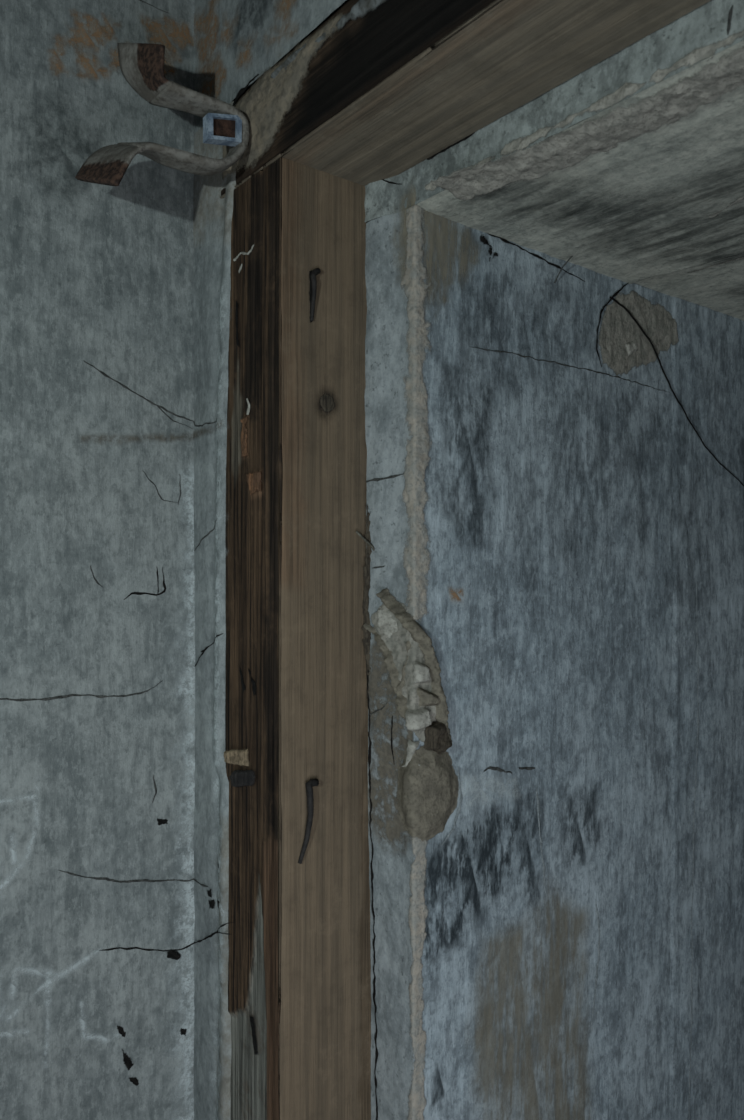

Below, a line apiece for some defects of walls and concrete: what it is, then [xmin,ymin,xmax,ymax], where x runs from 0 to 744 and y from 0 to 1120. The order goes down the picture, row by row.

crack [480,233,585,282]
spalling [596,283,679,376]
crack [472,347,670,393]
crack [84,361,217,429]
crack [143,471,181,504]
crack [90,565,166,600]
crack [195,633,223,666]
crack [0,680,163,701]
spalling [363,588,452,767]
crack [58,870,208,887]
crack [99,921,235,960]